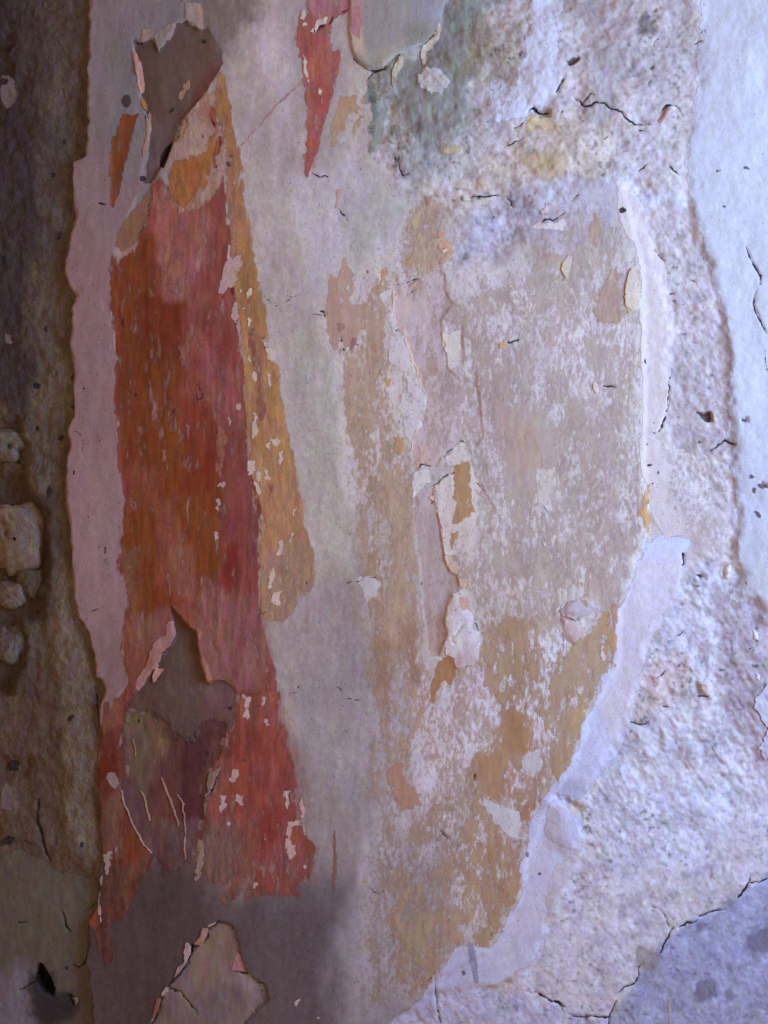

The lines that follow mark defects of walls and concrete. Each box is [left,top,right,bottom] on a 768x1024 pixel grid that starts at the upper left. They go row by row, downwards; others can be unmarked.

water stain [363,0,499,154]
water stain [526,115,559,133]
water stain [522,151,566,178]
crack [508,38,682,146]
water stain [580,25,624,124]
water stain [638,15,654,32]
spalling [0,0,237,970]
spalling [379,270,482,657]
peeling [479,797,521,840]
hole [21,964,78,1024]
spalling [151,922,267,1024]
crack [530,878,768,1024]